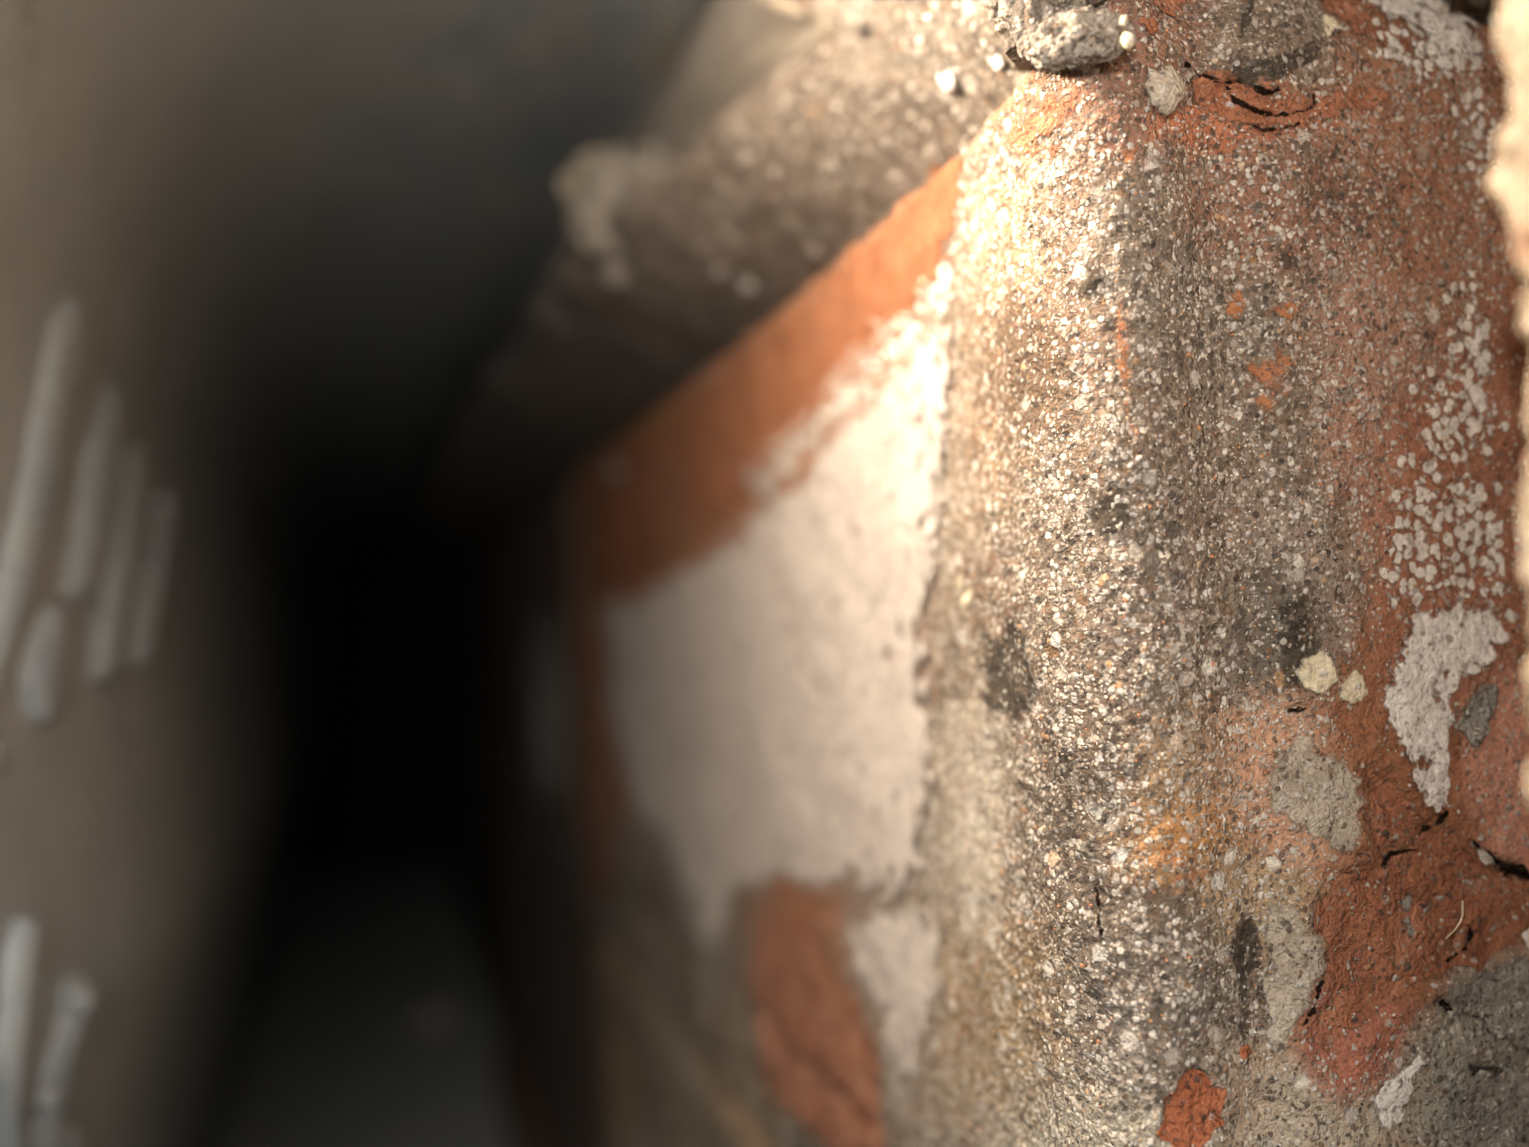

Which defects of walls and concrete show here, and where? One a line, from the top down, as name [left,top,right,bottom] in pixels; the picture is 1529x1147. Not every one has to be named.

flaking render [1322,0,1410,62]
peeling [983,0,1186,156]
crack [1184,61,1317,132]
spalling [1193,70,1407,126]
flaking render [593,155,962,591]
crack [1358,811,1529,880]
spalling [1313,765,1526,1052]
spalling [1155,1069,1227,1147]